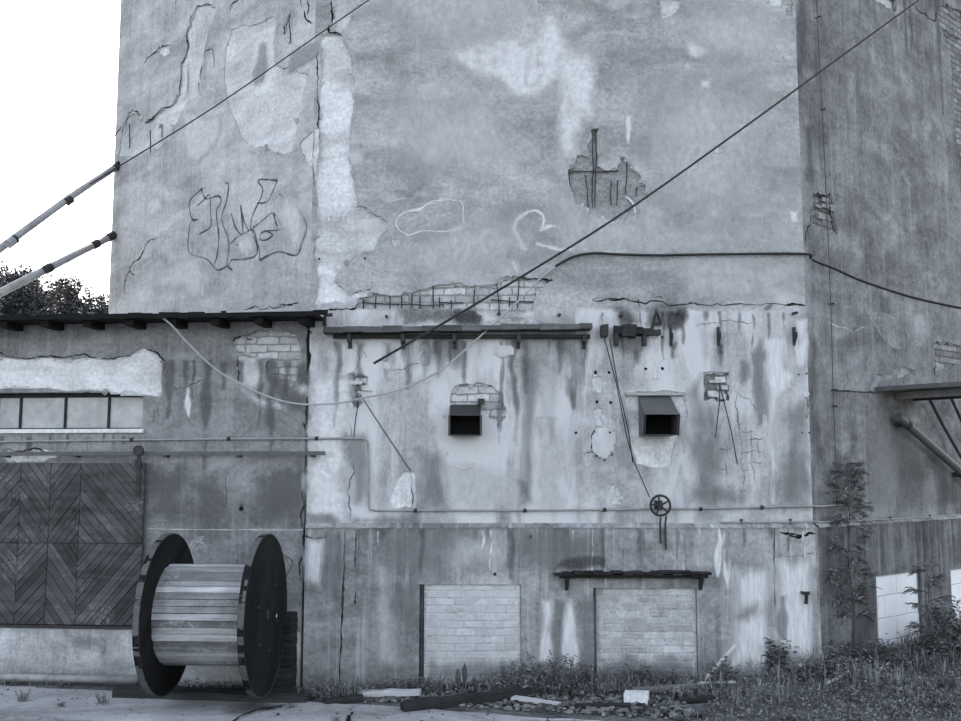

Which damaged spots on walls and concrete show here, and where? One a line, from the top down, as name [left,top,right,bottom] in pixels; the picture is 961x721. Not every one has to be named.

crack [108,0,238,154]
flaking render [225,0,551,324]
spalling [568,127,648,221]
damp [165,361,210,423]
flaking render [232,330,302,390]
damp [252,359,363,523]
flaking render [450,382,507,431]
crack [719,393,763,491]
flaking render [390,471,417,509]
damp [306,536,334,584]
damp [453,530,502,571]
damp [377,568,394,663]